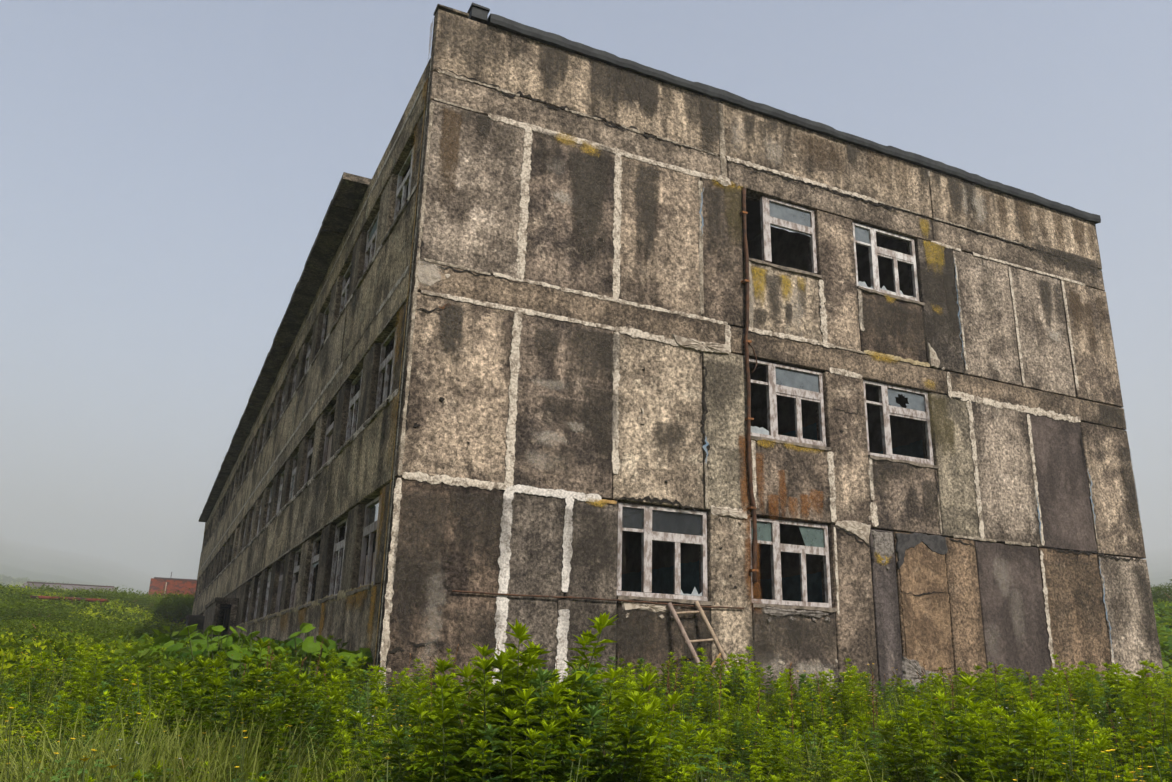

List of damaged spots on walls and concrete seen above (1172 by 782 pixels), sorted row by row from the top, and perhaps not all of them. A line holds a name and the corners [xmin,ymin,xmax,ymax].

damp [440,108,462,190]
damp [540,44,568,88]
damp [590,59,658,115]
damp [683,91,723,153]
damp [745,115,777,146]
damp [555,145,611,269]
damp [920,167,983,219]
damp [998,197,1100,276]
damp [394,492,515,614]
corrosion [739,436,823,595]
peeling [835,516,953,693]